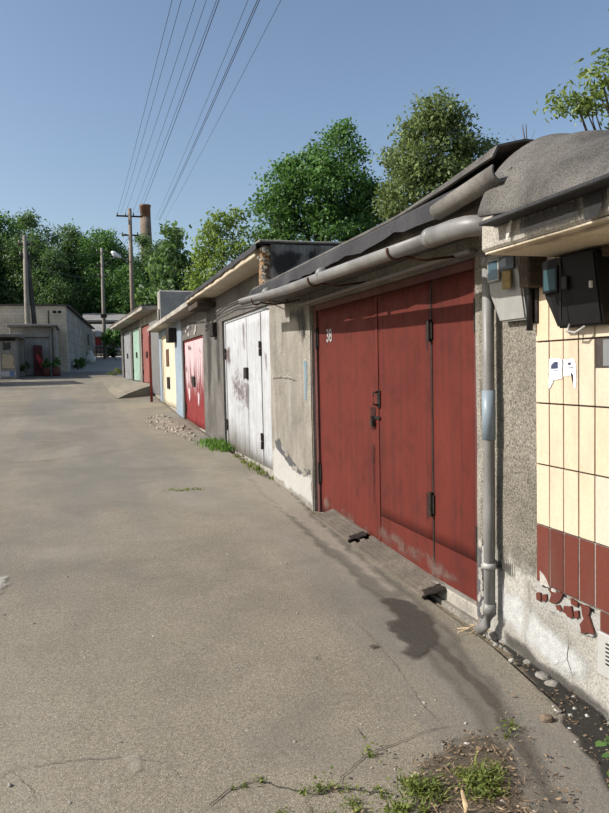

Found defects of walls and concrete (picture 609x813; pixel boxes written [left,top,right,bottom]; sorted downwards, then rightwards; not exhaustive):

peeling [181,324,204,404]
flaking render [273,438,312,504]
spalling [536,571,600,637]
crack [206,780,406,808]